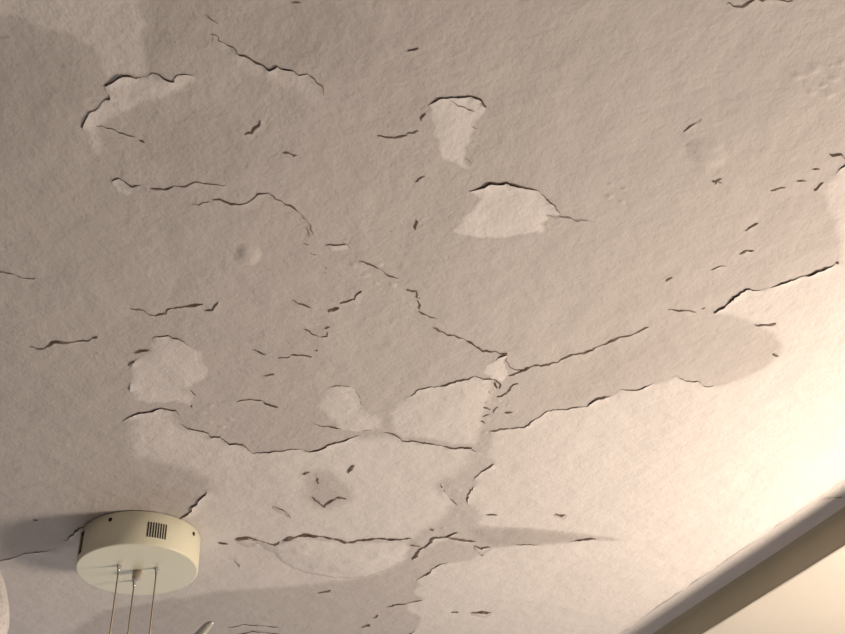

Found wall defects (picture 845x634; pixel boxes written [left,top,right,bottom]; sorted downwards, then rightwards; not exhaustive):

crack [727,0,793,16]
peeling [0,0,196,158]
peeling [211,34,330,118]
peeling [429,96,486,170]
crack [30,336,98,357]
crack [131,302,223,322]
peeling [0,154,845,634]
crack [219,506,492,568]